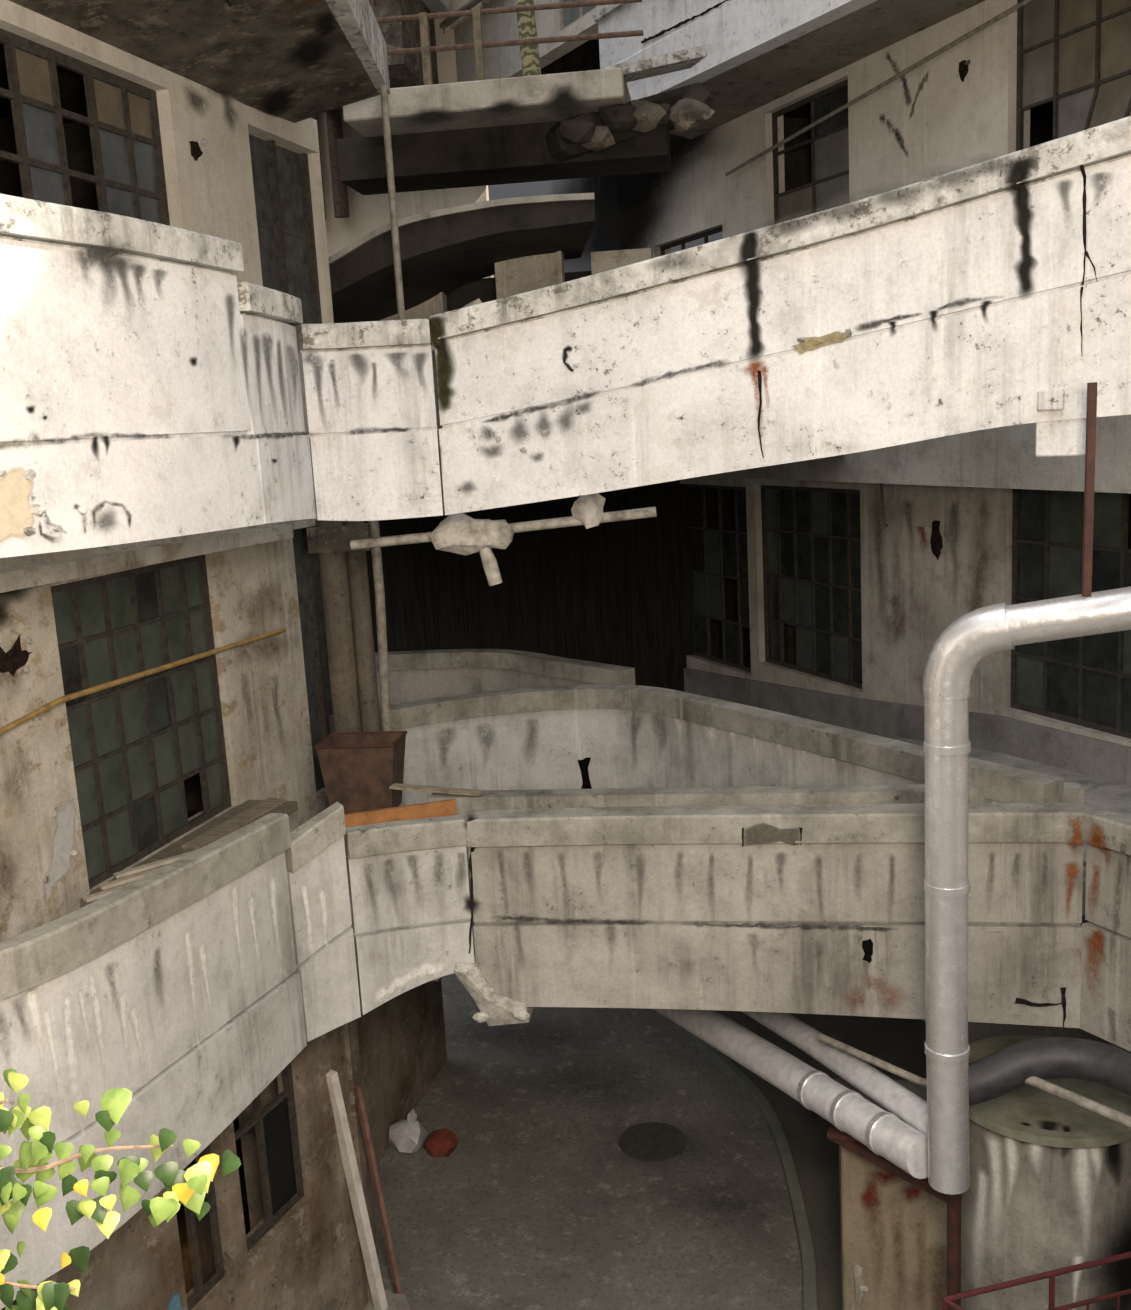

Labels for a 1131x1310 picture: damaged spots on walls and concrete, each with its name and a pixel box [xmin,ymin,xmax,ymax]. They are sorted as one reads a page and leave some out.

leakage [741,232,763,358]
leakage [980,159,1035,294]
crack [1079,165,1097,353]
leakage [392,318,452,410]
corrosion [747,363,767,400]
peeling [0,469,41,542]
spalling [0,635,33,676]
corrosion [1070,820,1107,850]
corrosion [1067,864,1077,903]
corrosion [1088,932,1103,976]
leakage [973,1137,1041,1262]
leakage [1063,1143,1120,1227]